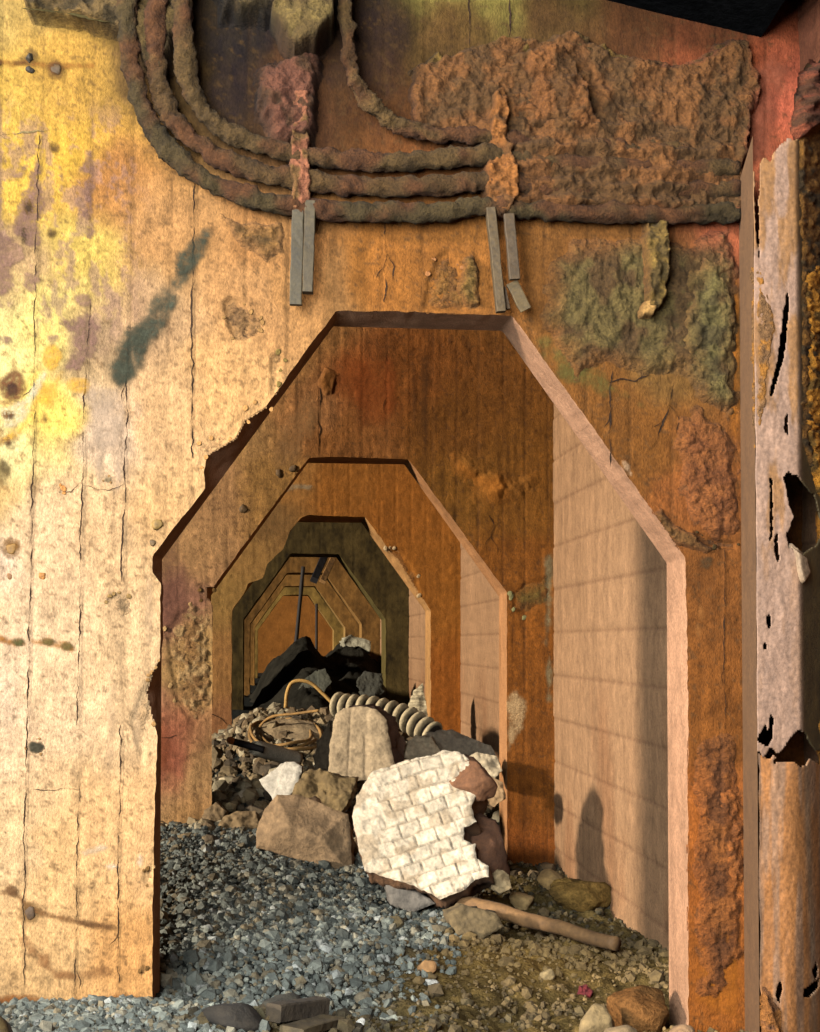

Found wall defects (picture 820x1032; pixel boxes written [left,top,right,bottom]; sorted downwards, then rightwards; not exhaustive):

rust [407,30,781,209]
water stain [4,346,61,440]
water stain [111,231,209,386]
spalling [222,302,265,340]
spalling [425,258,476,315]
rust [750,267,775,448]
rust [790,59,820,497]
rust [671,405,741,543]
spalling [133,582,217,743]